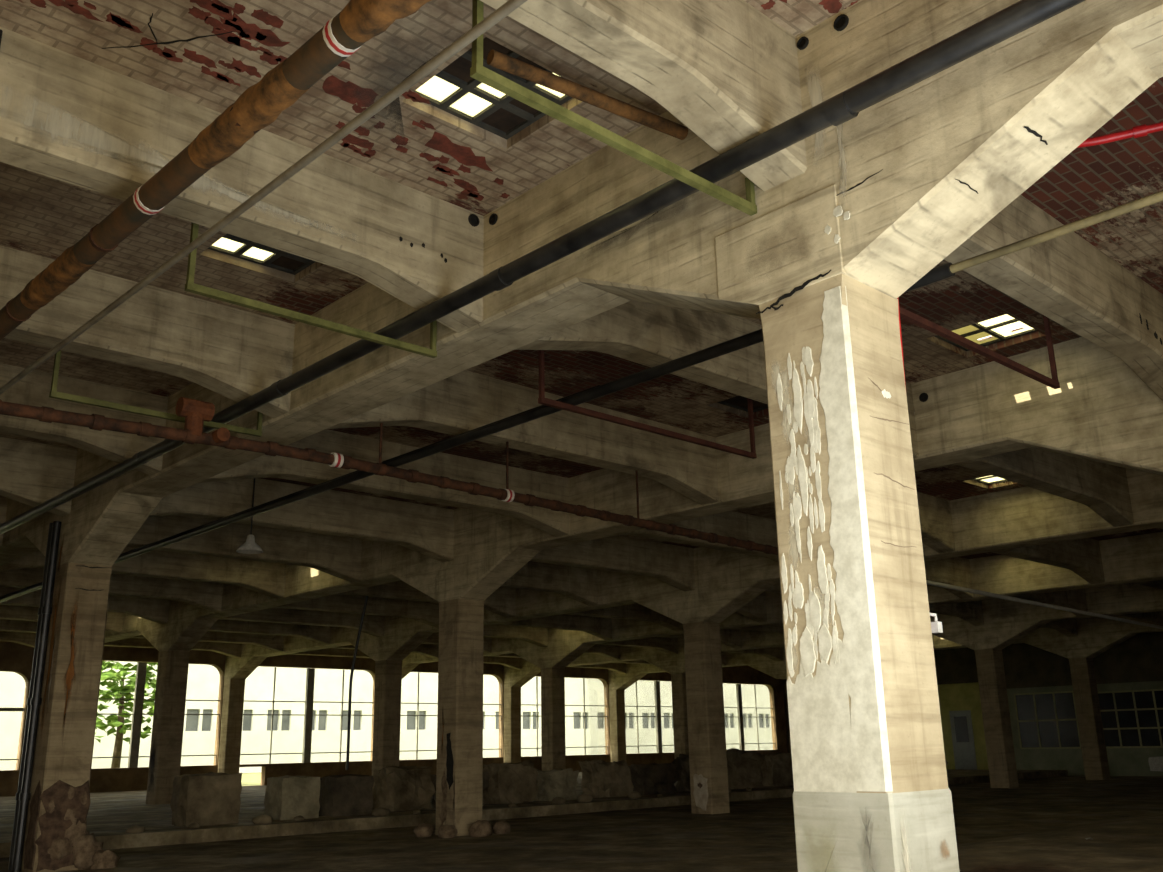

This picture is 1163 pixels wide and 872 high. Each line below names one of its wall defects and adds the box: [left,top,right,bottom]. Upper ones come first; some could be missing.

peeling [30,0,290,87]
peeling [818,0,858,13]
peeling [322,61,385,158]
peeling [402,90,431,104]
peeling [391,120,510,201]
crack [756,270,831,314]
peeling [773,286,893,793]
rust [63,612,76,720]
spalling [24,780,121,872]